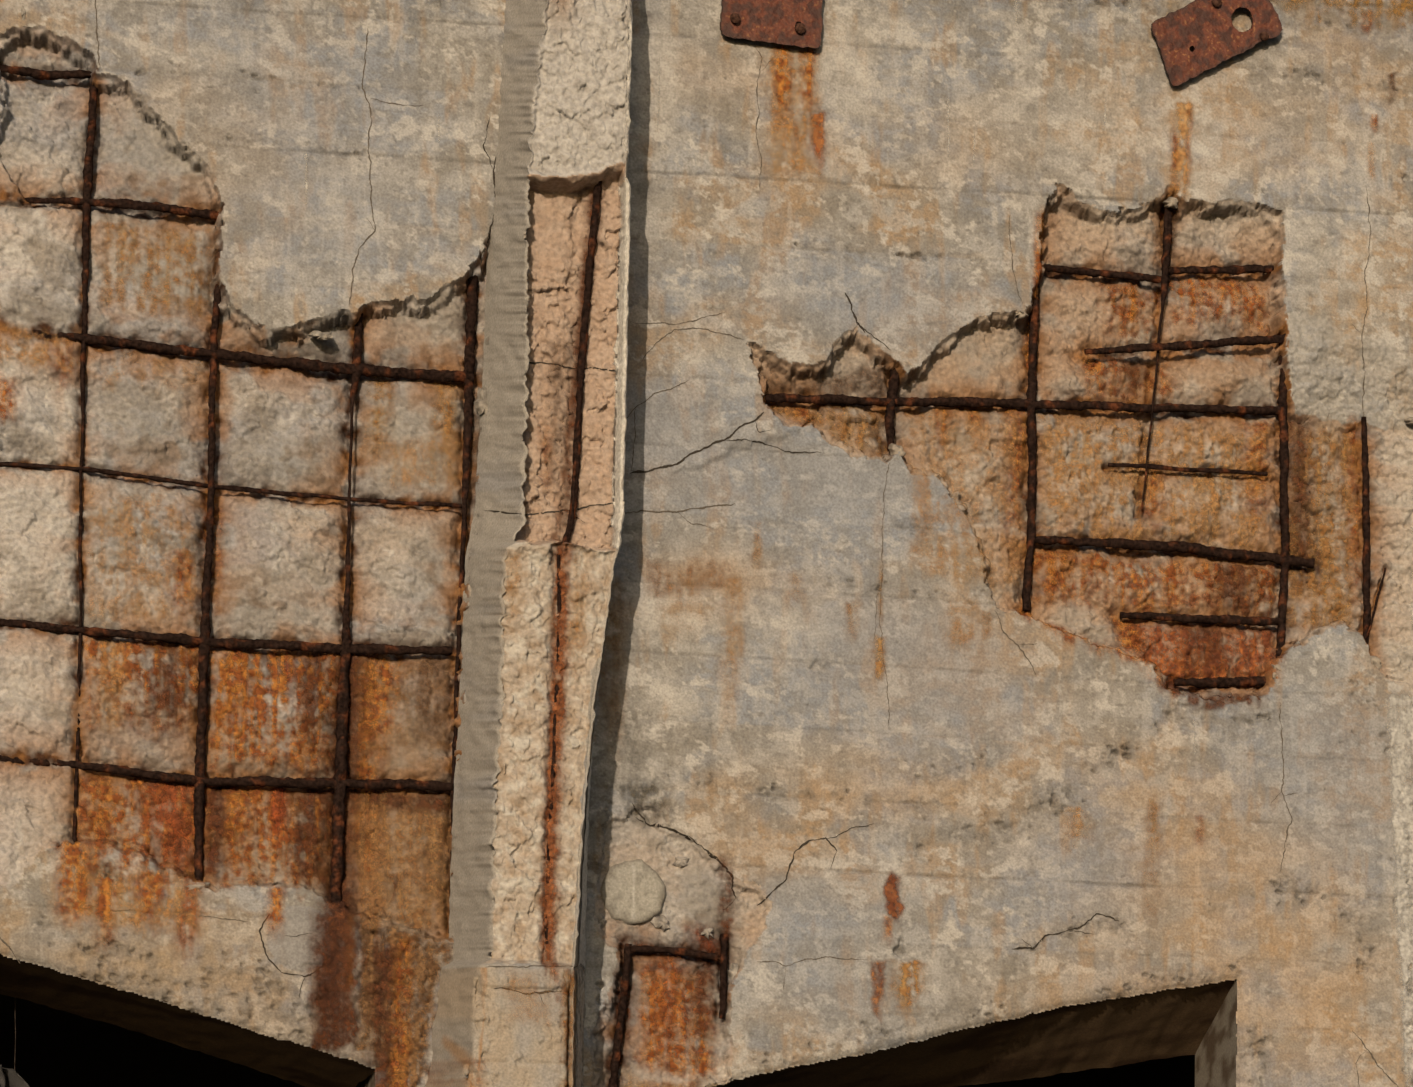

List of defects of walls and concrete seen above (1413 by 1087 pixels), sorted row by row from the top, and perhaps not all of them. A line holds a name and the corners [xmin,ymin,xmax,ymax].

spalling [0,5,493,943]
crack [485,502,735,526]
spalling [482,0,774,1087]
crack [529,313,815,474]
crack [845,293,890,350]
spalling [746,182,1413,1087]
rust [1016,417,1360,709]
rust [1109,278,1268,334]
rust [58,639,453,1087]
rust [540,546,580,1086]
crack [632,803,871,909]
rust [884,873,904,934]